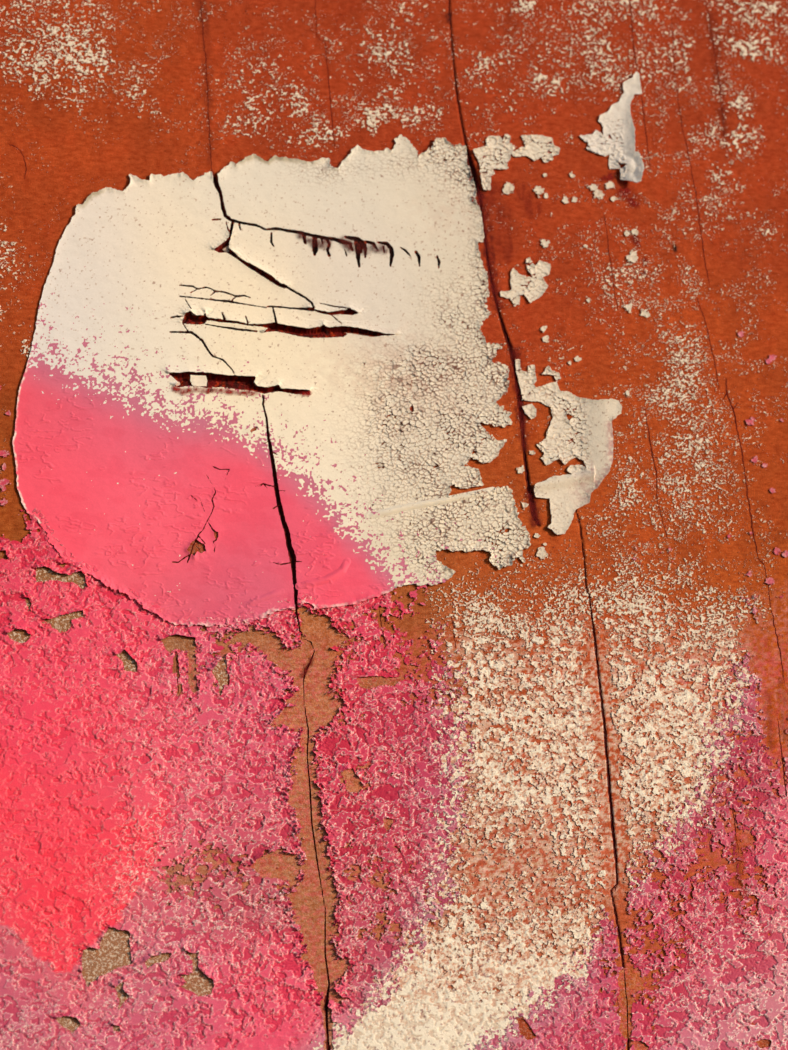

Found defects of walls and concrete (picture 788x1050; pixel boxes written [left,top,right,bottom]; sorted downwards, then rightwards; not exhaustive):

peeling [502,182,514,195]
peeling [528,172,615,208]
rust [299,232,388,254]
rust [477,194,502,308]
crack [449,0,540,526]
rust [510,352,526,447]
rust [525,488,540,526]
peeling [161,634,200,694]
crack [261,396,330,1050]
crack [576,510,629,1050]
peeling [82,927,132,987]
peeling [180,950,214,997]